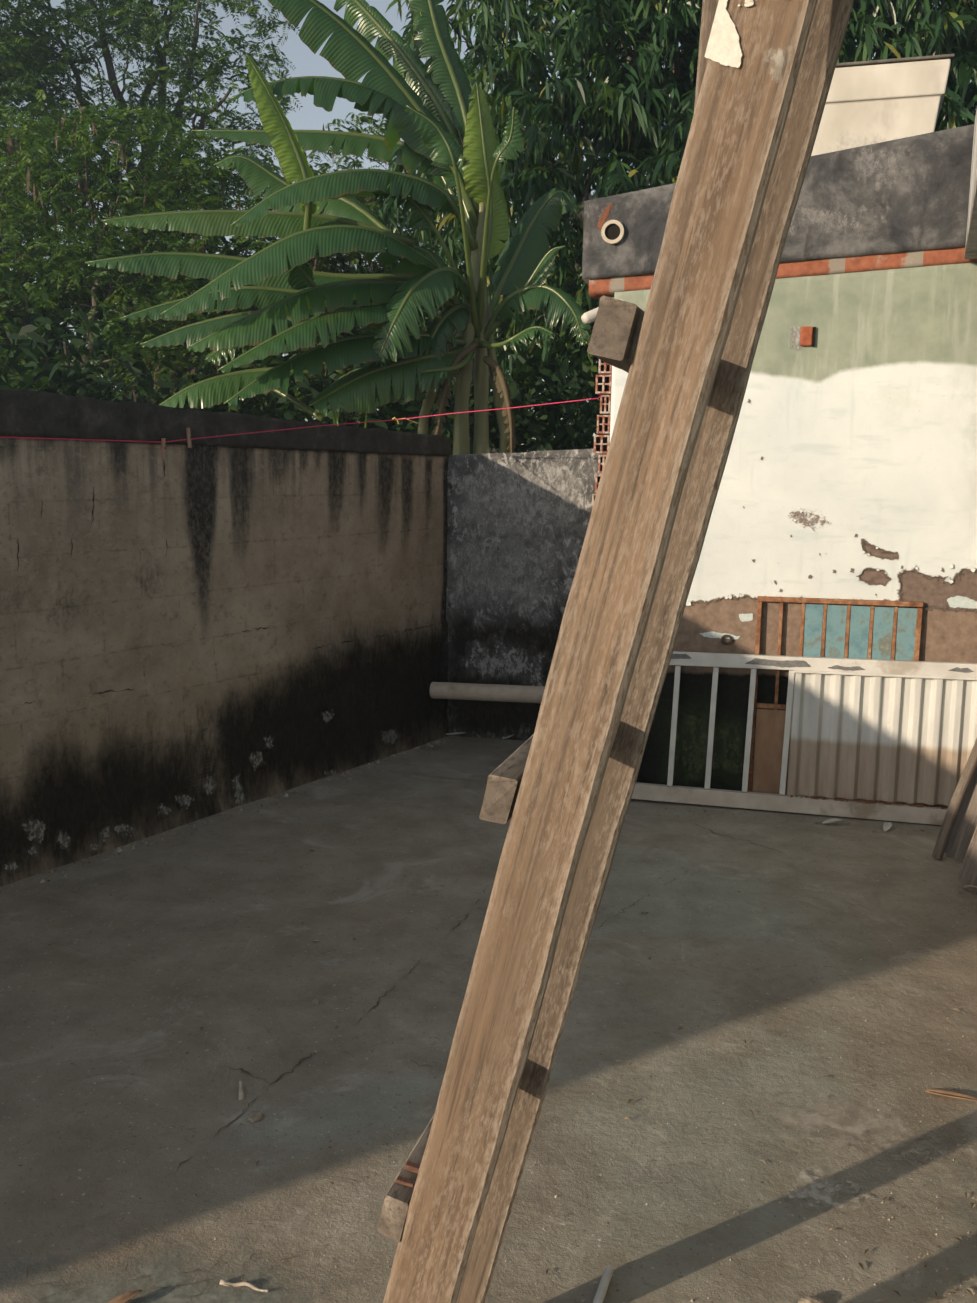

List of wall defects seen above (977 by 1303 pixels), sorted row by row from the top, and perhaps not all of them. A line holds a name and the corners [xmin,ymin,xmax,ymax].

peeling [788,511,829,537]
leakage [0,445,578,885]
peeling [667,534,977,677]
crack [175,957,433,1173]
crack [0,1249,307,1303]